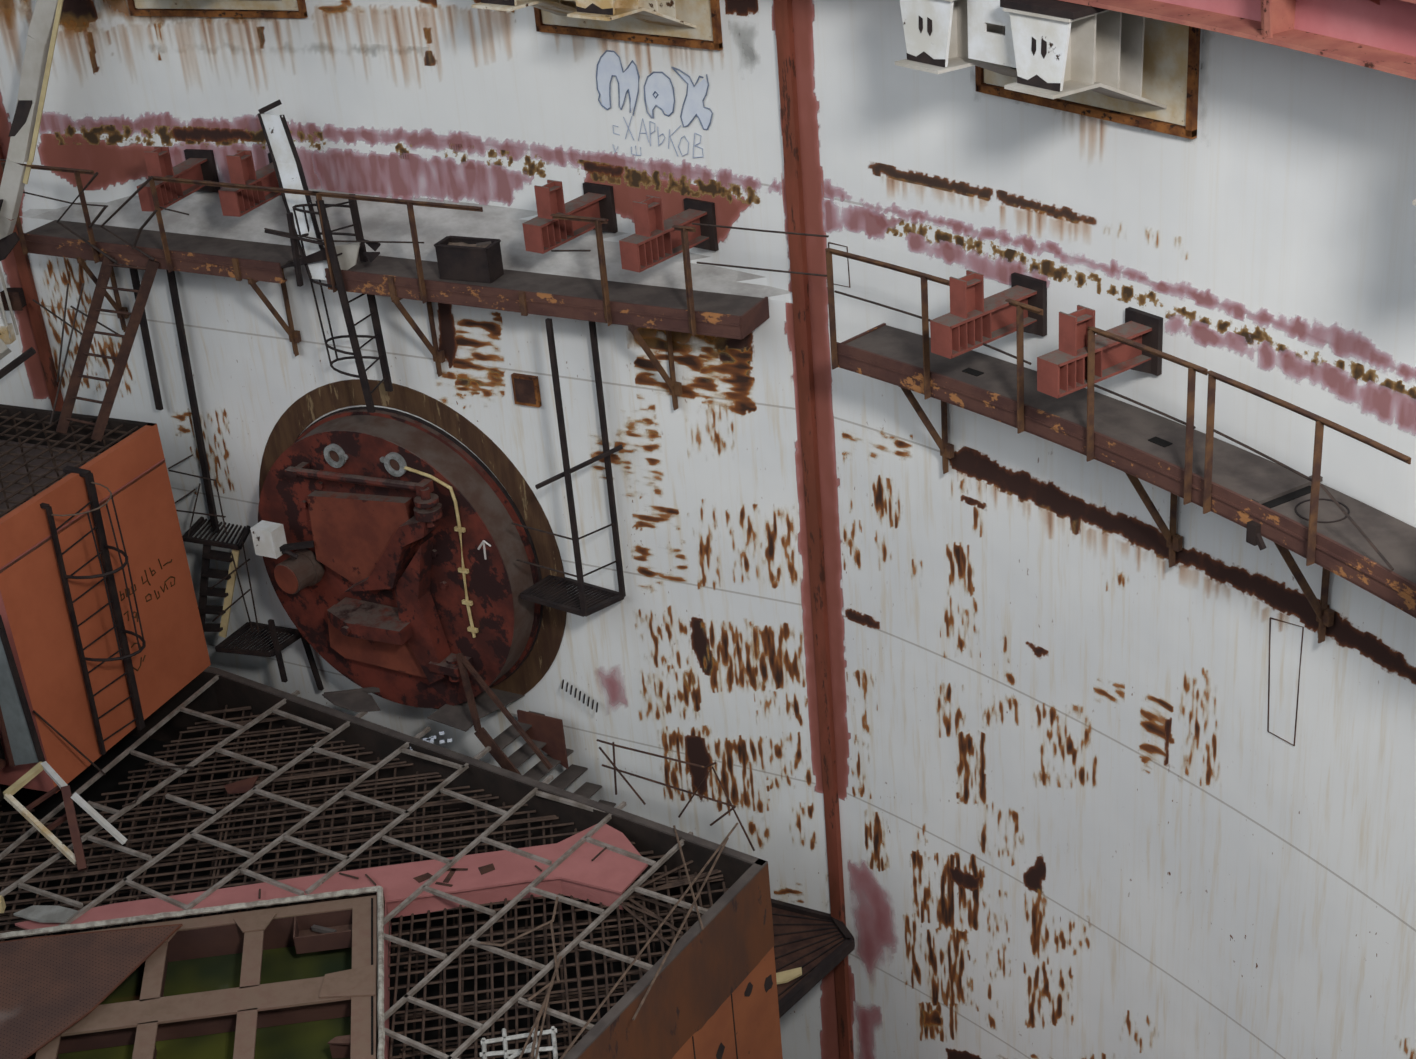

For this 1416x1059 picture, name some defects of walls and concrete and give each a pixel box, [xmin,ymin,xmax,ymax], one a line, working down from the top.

corrosion [319,0,352,32]
corrosion [869,163,1096,228]
corrosion [437,303,505,409]
corrosion [879,214,1416,401]
corrosion [614,327,797,590]
corrosion [940,446,1416,684]
corrosion [635,606,811,847]
corrosion [796,803,816,850]
corrosion [846,670,888,871]
corrosion [905,683,1097,1059]
corrosion [1093,683,1125,702]
corrosion [1139,668,1219,786]